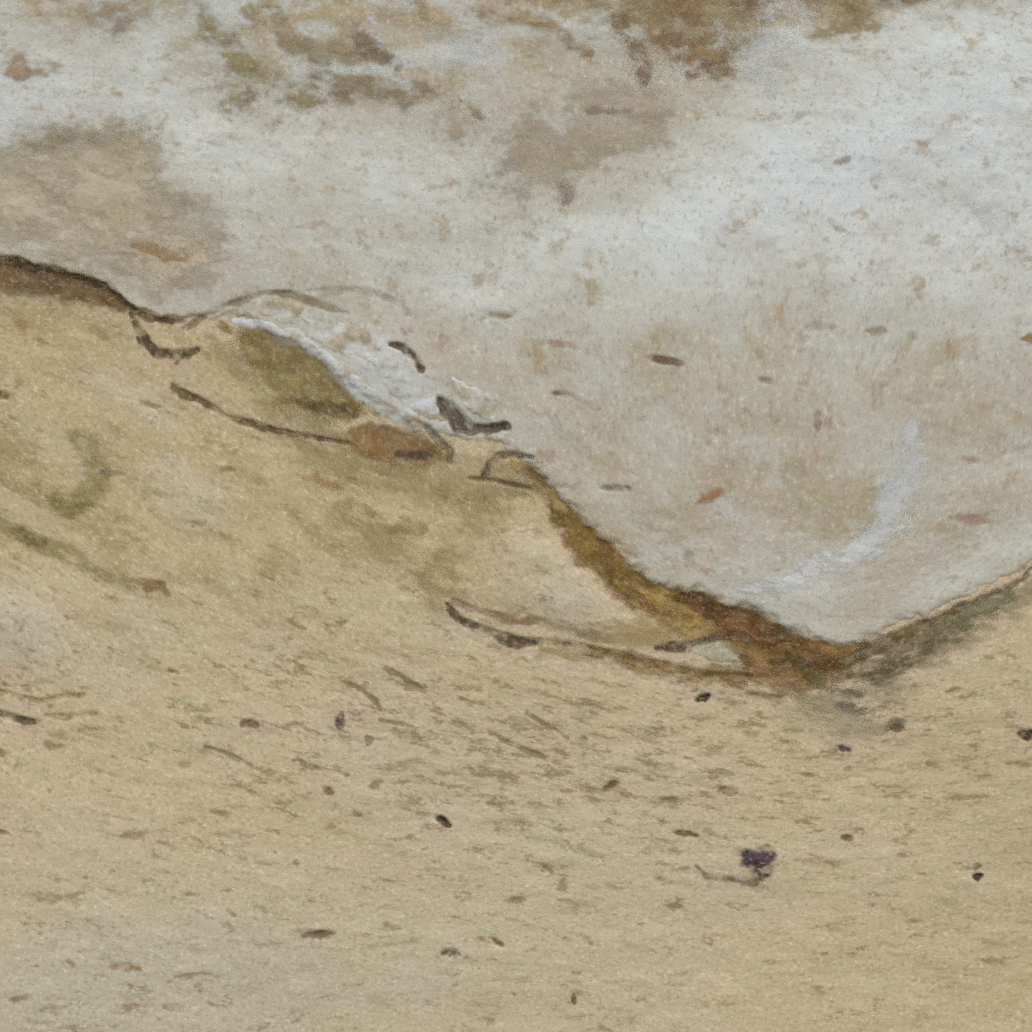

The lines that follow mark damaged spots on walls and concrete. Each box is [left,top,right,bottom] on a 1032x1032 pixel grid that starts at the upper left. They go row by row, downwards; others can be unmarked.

leakage [199,7,262,106]
leakage [277,17,434,107]
leakage [500,83,672,204]
crack [0,257,344,443]
peeling [0,0,1032,669]
efflorescence [742,421,927,593]
leakage [585,618,715,647]
leakage [798,582,1032,715]